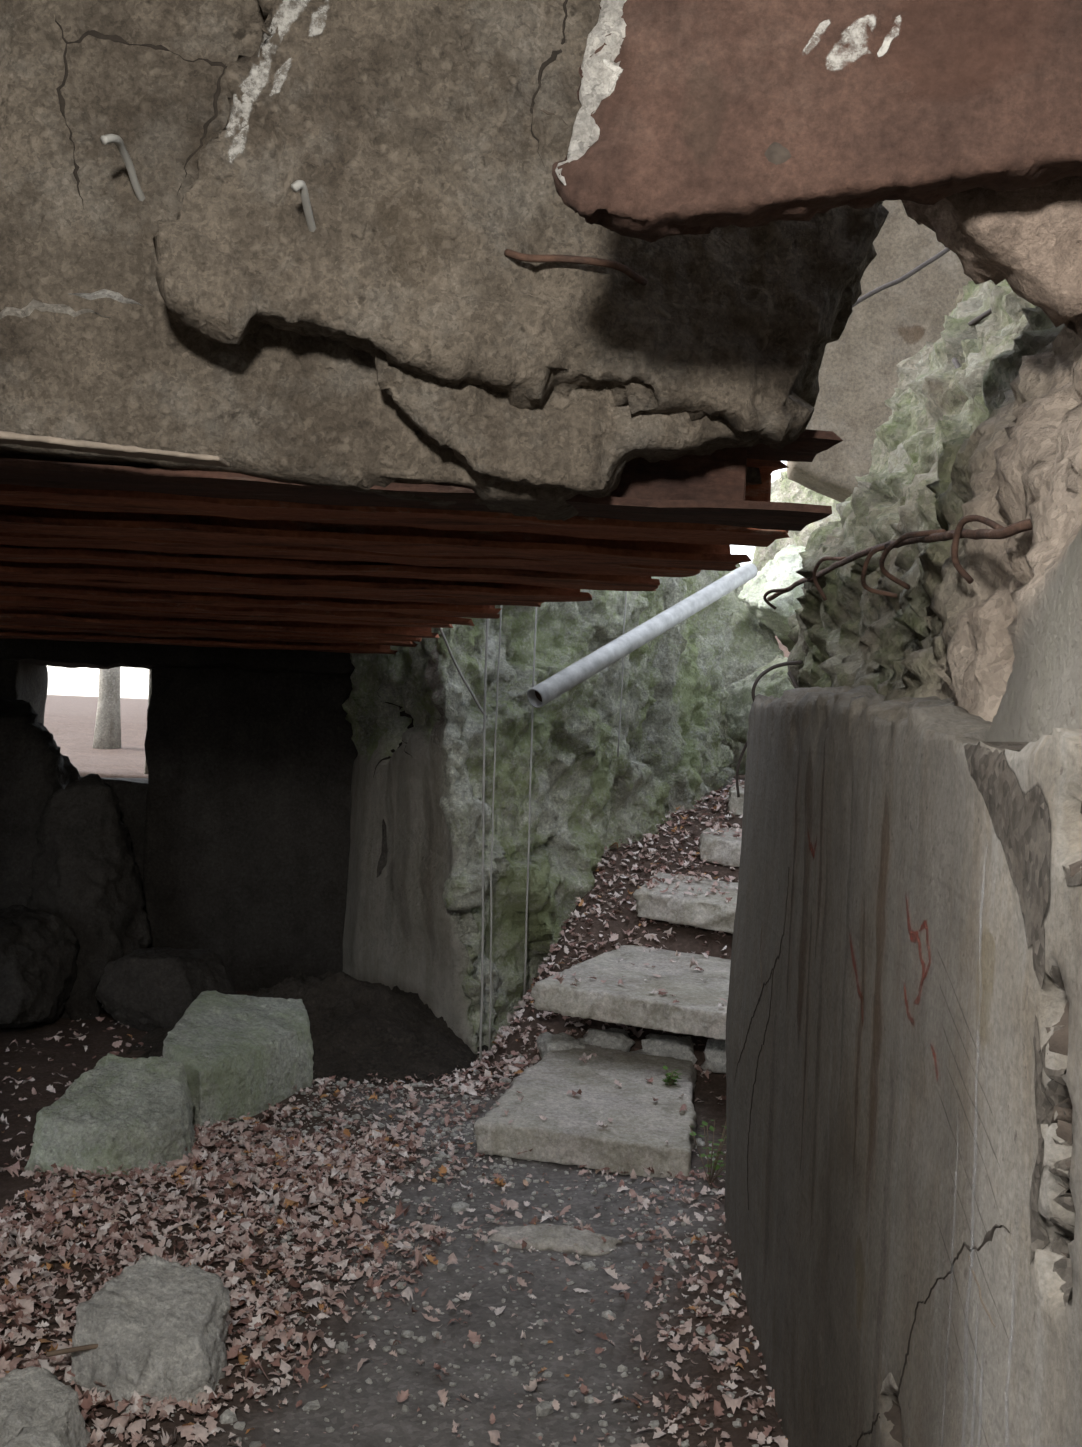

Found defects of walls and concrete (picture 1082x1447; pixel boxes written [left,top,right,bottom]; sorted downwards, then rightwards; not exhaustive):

crack [55,17,227,209]
spalling [555,0,627,185]
crack [734,869,789,1210]
peeling [964,742,1082,1306]
crack [848,1224,1010,1447]